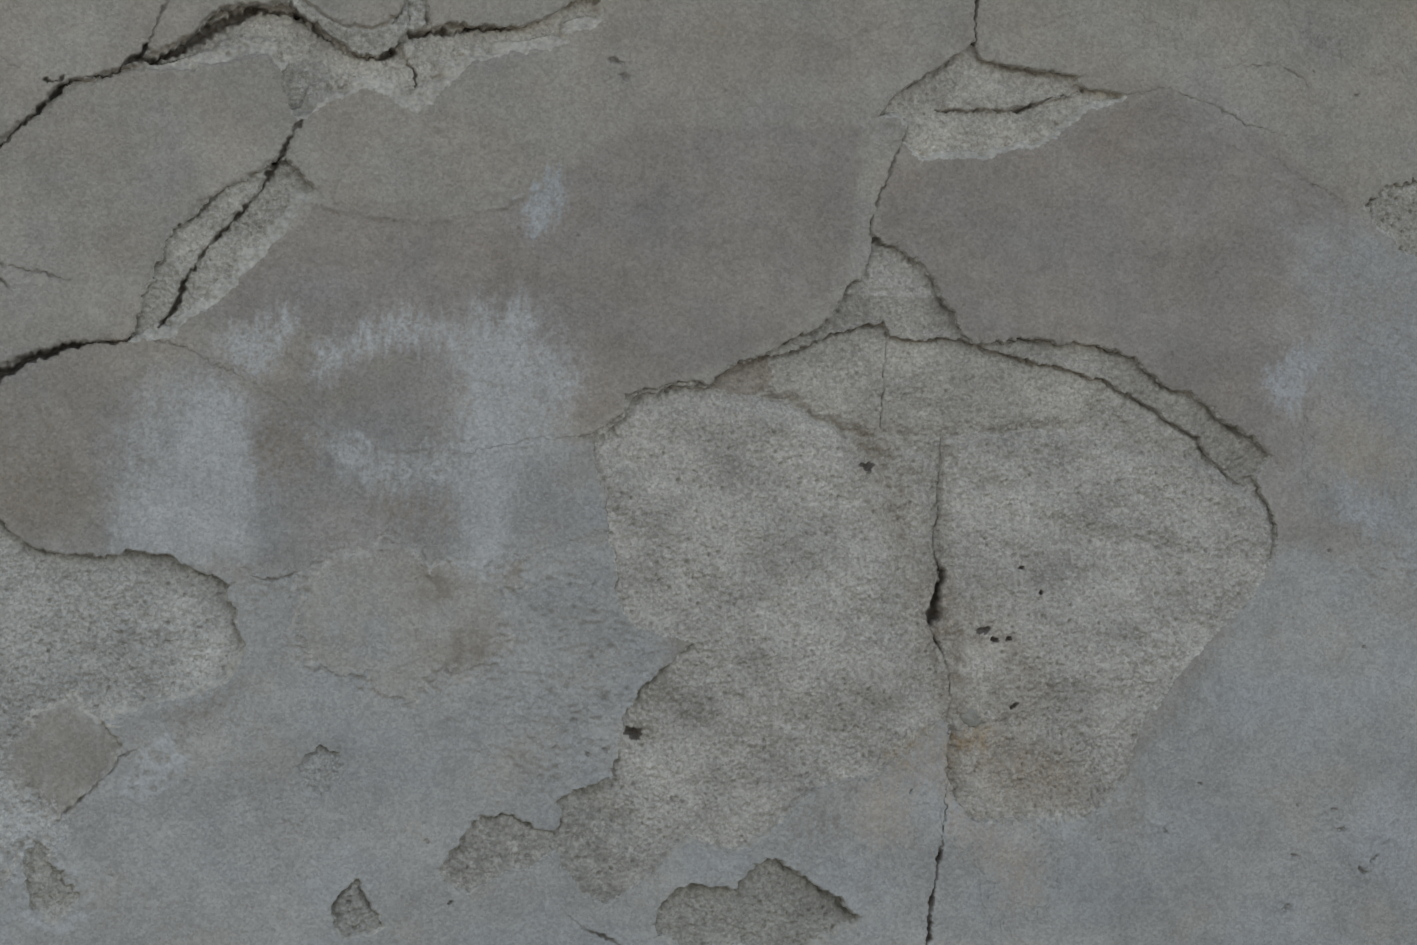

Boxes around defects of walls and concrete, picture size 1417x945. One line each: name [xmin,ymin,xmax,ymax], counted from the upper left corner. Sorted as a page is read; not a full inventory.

crack [0,0,513,149]
spalling [147,0,605,121]
spalling [880,42,1127,162]
crack [0,119,314,420]
spalling [128,158,316,345]
crack [869,142,904,239]
crack [880,334,889,429]
spalling [0,521,246,766]
spalling [410,237,1279,945]
crack [925,438,954,713]
spalling [331,878,387,942]
crack [926,800,948,945]